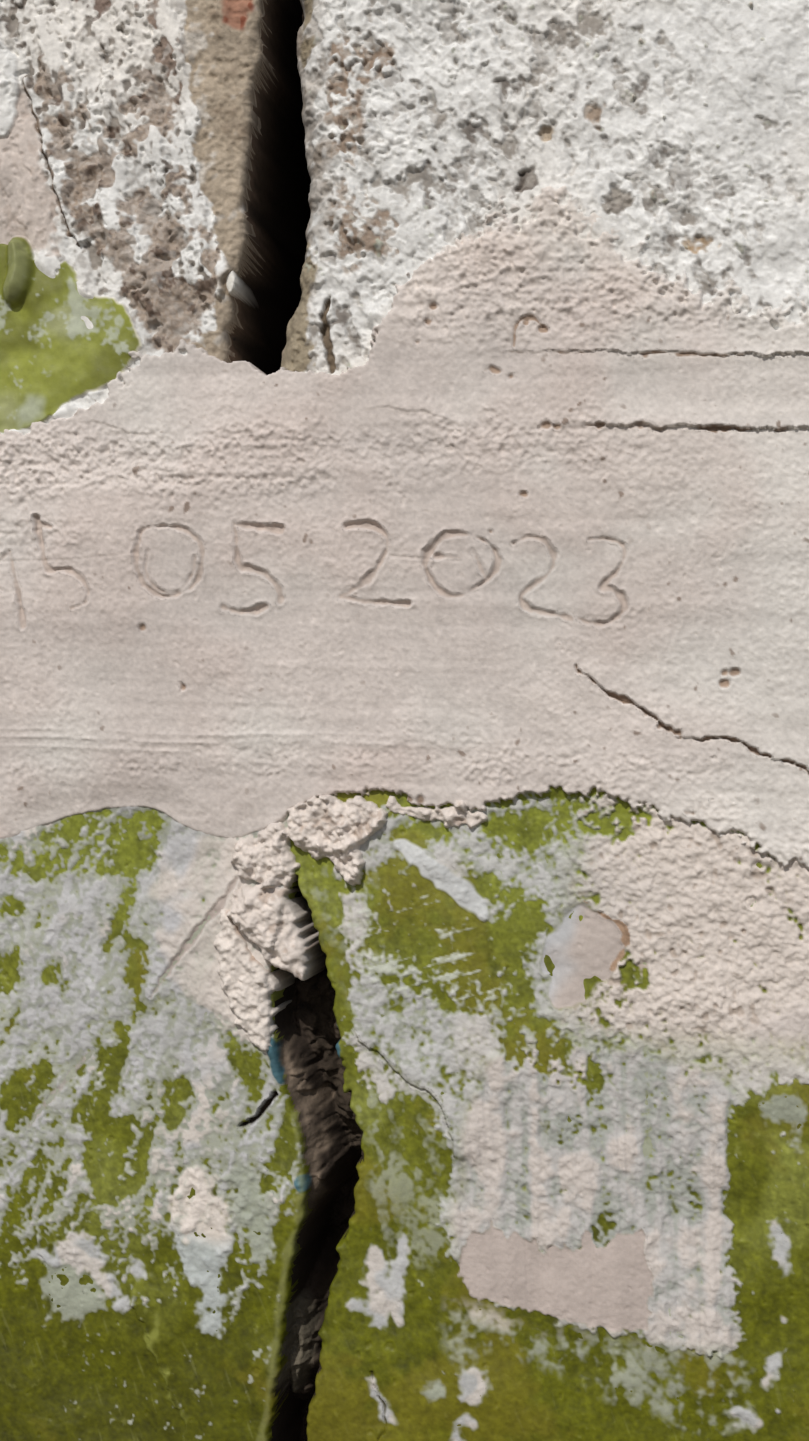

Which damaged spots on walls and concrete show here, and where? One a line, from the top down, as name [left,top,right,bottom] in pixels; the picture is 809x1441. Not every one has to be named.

spalling [0,0,275,434]
crack [229,0,337,375]
spalling [513,165,540,194]
spalling [597,186,669,218]
crack [503,348,809,360]
crack [582,419,809,434]
crack [574,664,809,777]
water stain [340,837,505,1014]
water stain [0,1000,294,1316]
peeling [254,1108,313,1441]
crack [237,968,457,1441]
peeling [415,788,809,1441]